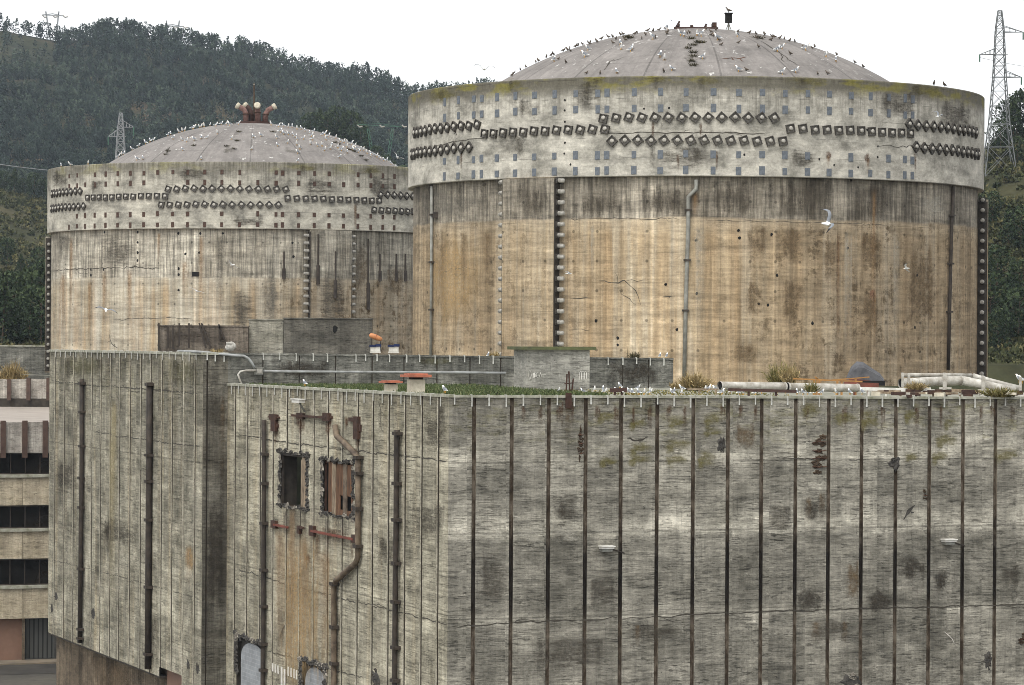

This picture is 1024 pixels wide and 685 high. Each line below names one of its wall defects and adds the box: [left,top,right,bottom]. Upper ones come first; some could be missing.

crack [55,264,159,274]
crack [574,277,672,305]